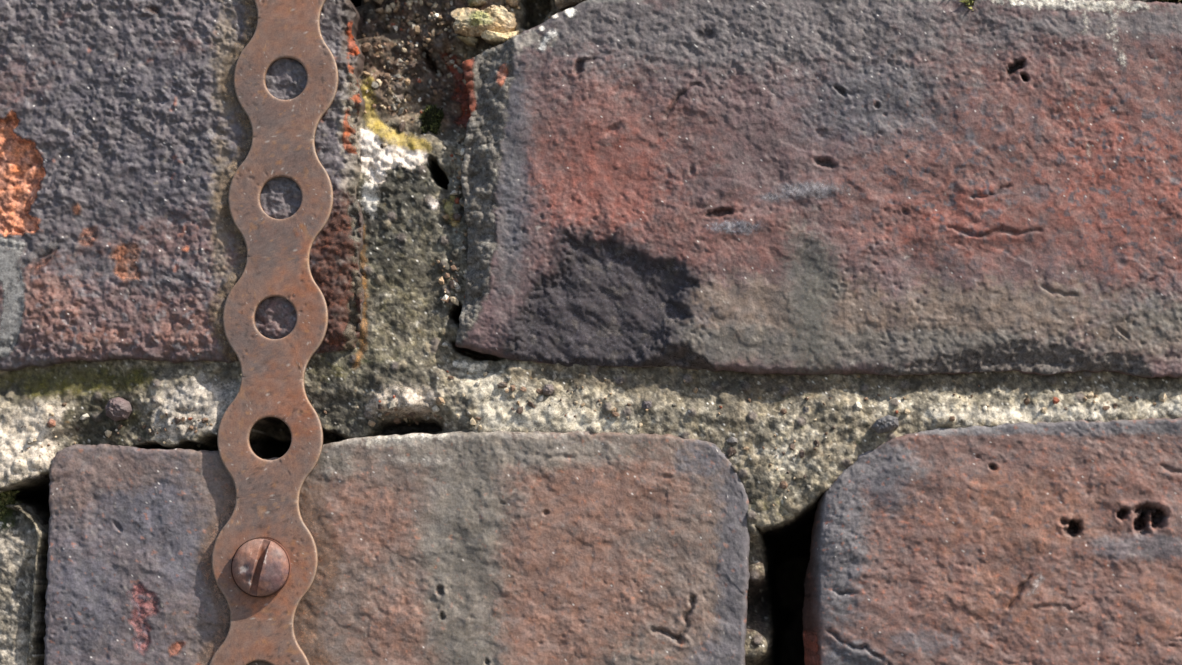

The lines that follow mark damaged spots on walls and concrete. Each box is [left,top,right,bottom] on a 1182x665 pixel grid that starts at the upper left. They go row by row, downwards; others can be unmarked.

spalling [0,110,46,237]
corrosion [211,0,258,362]
corrosion [312,204,368,368]
corrosion [294,486,341,665]